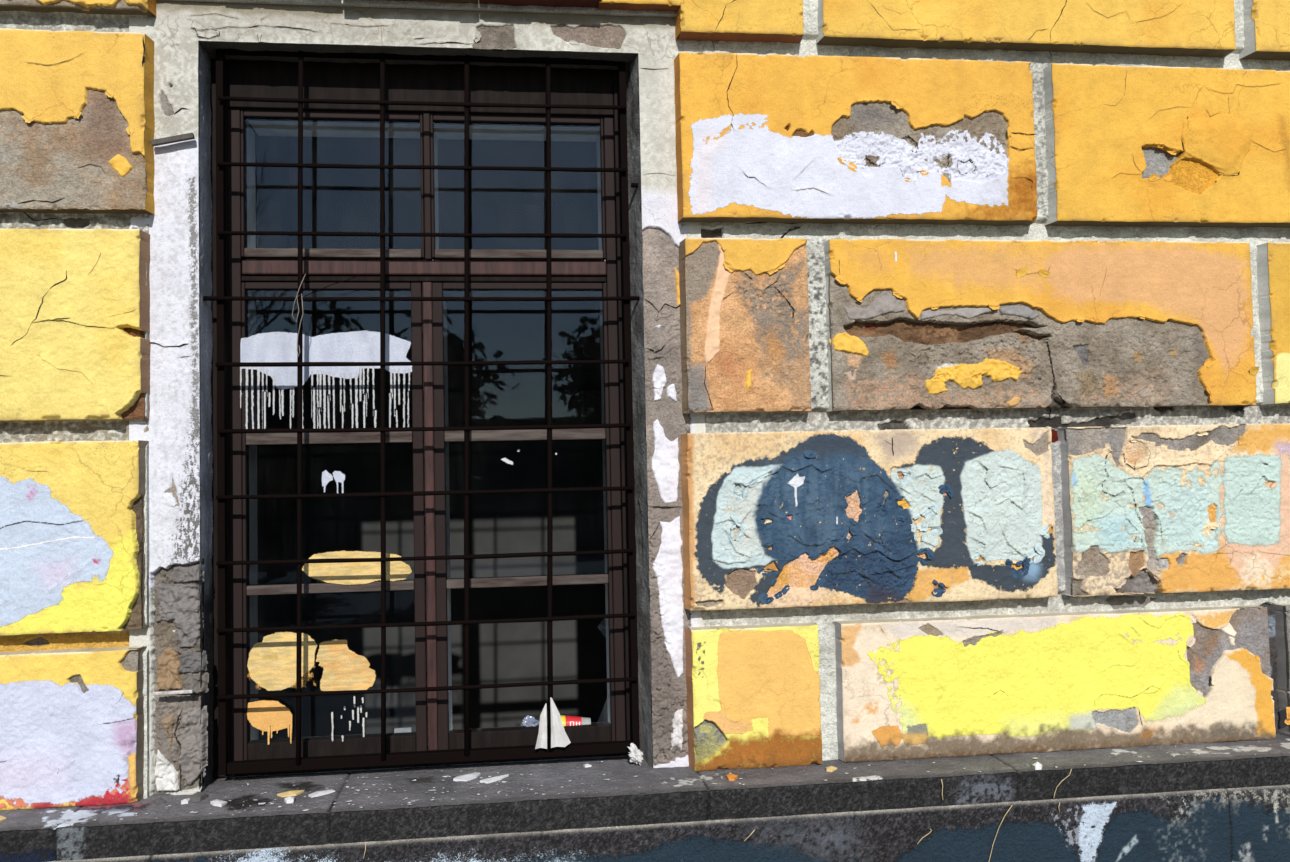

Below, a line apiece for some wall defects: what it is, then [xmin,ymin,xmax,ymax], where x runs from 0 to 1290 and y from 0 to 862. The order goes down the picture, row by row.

crack [712,0,738,129]
peeling [0,89,147,229]
flaking render [785,126,814,137]
flaking render [831,98,1013,183]
peeling [1142,143,1218,195]
crack [1,253,132,387]
flaking render [828,274,1246,467]
peeling [642,228,954,766]
flaking render [1070,507,1186,609]
peeling [69,674,89,693]
flaking render [121,495,227,807]
flaking render [1186,603,1290,734]